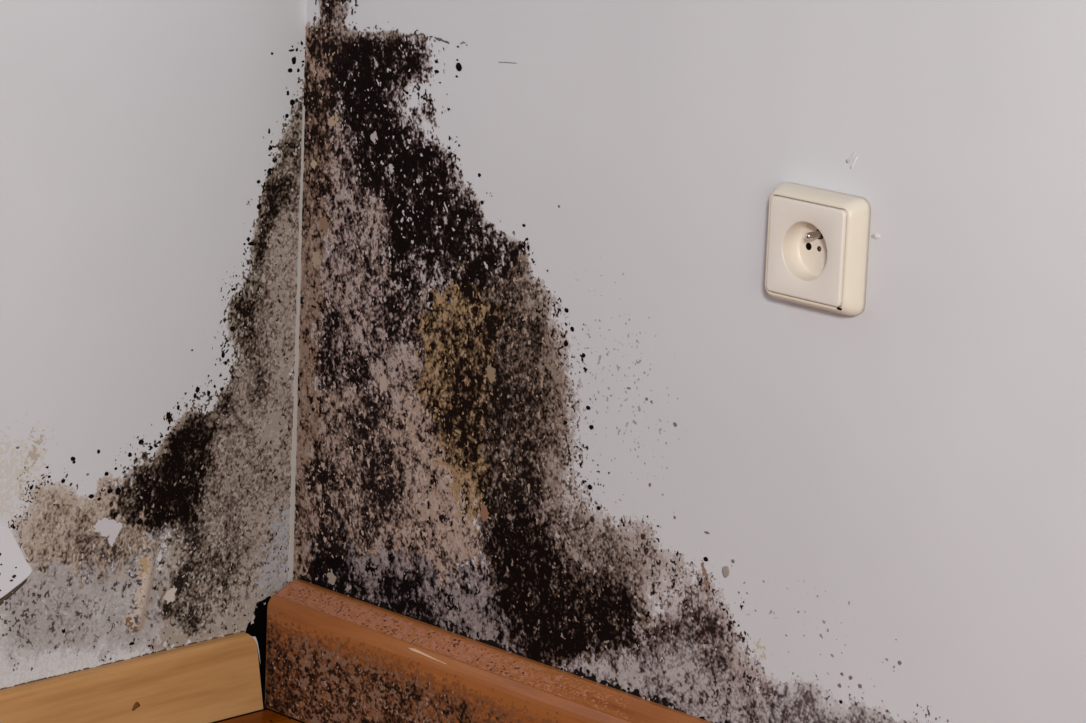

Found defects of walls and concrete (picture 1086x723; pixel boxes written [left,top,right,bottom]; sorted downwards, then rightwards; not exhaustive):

peeling [0,525,33,599]
mould [265,612,558,723]